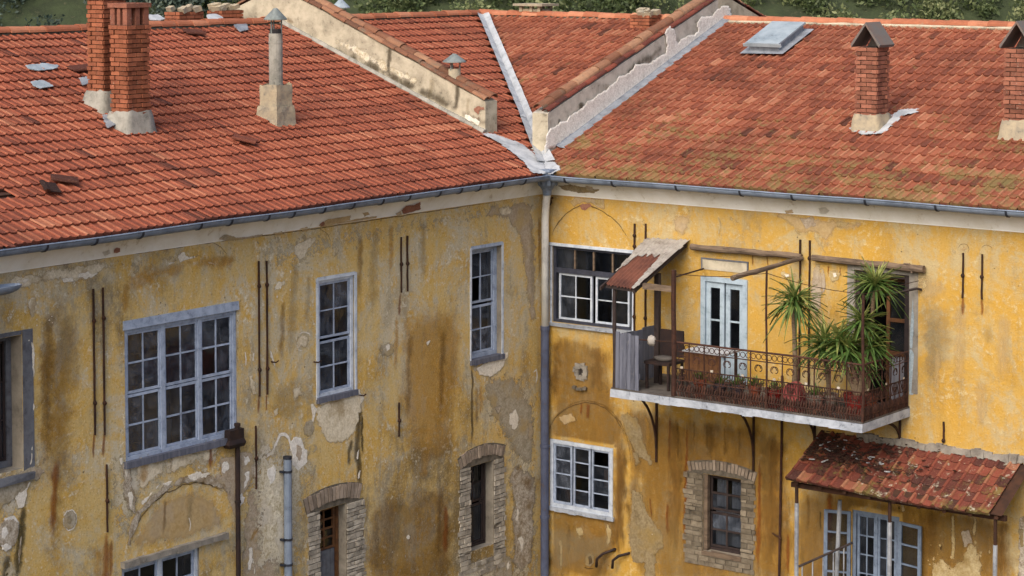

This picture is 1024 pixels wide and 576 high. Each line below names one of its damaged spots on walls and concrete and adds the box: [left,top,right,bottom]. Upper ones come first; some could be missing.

flaking render [108,389,364,576]
flaking render [450,352,541,576]
peeling [928,516,991,576]